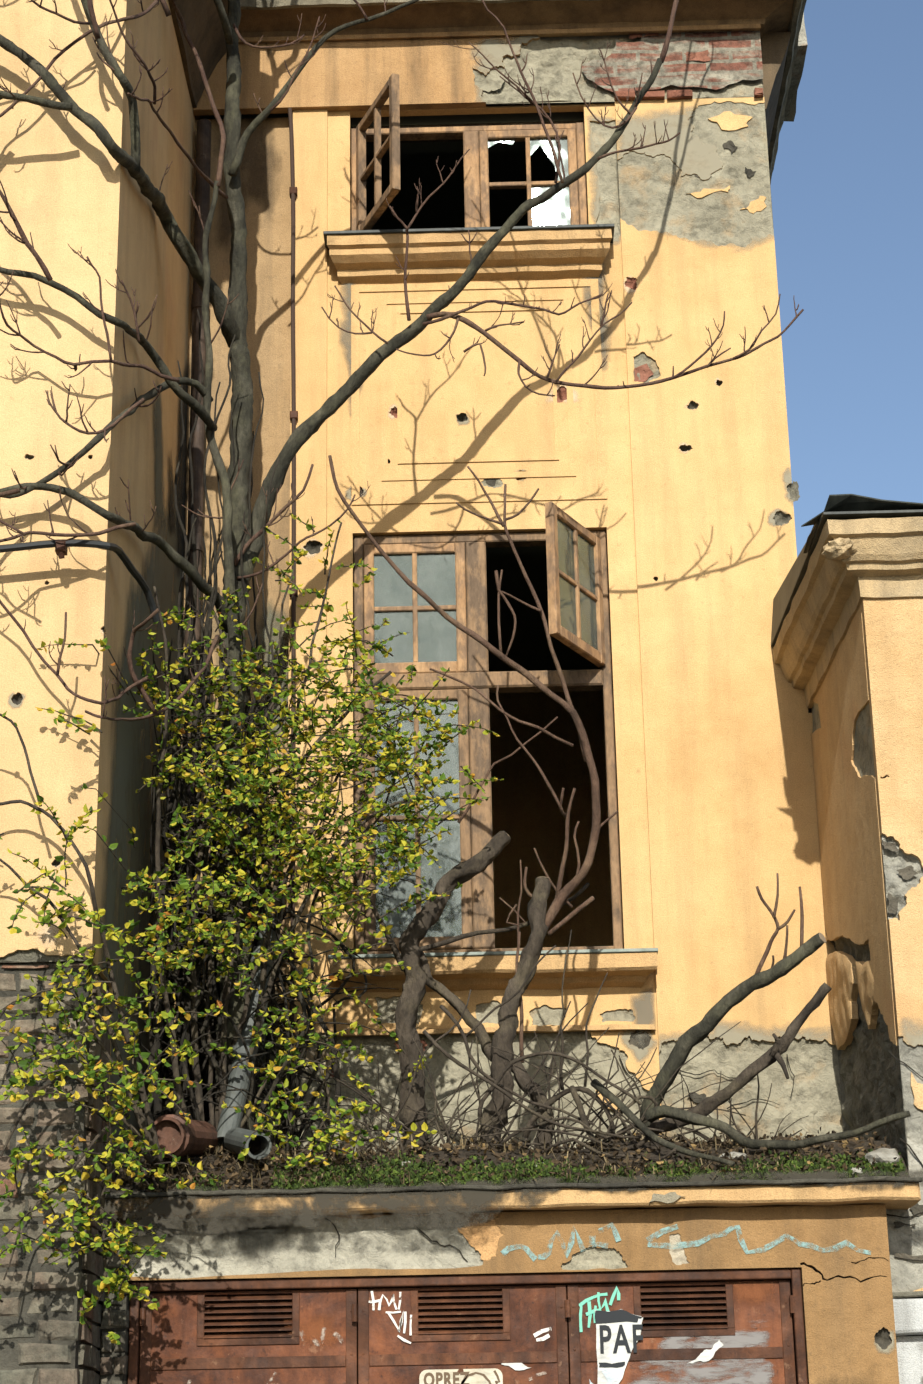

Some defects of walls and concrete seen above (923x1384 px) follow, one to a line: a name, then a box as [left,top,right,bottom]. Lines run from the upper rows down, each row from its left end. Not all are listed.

flaking render [473,31,774,247]
damp [342,283,352,369]
damp [98,363,560,1255]
flaking render [881,835,923,920]
flaking render [417,1000,500,1150]
damp [634,990,679,1052]
damp [708,1024,828,1045]
flaking render [501,991,923,1292]
damp [576,1170,923,1192]
flaking render [115,1215,504,1279]
crack [800,1258,885,1285]
corrosion [300,1319,334,1343]